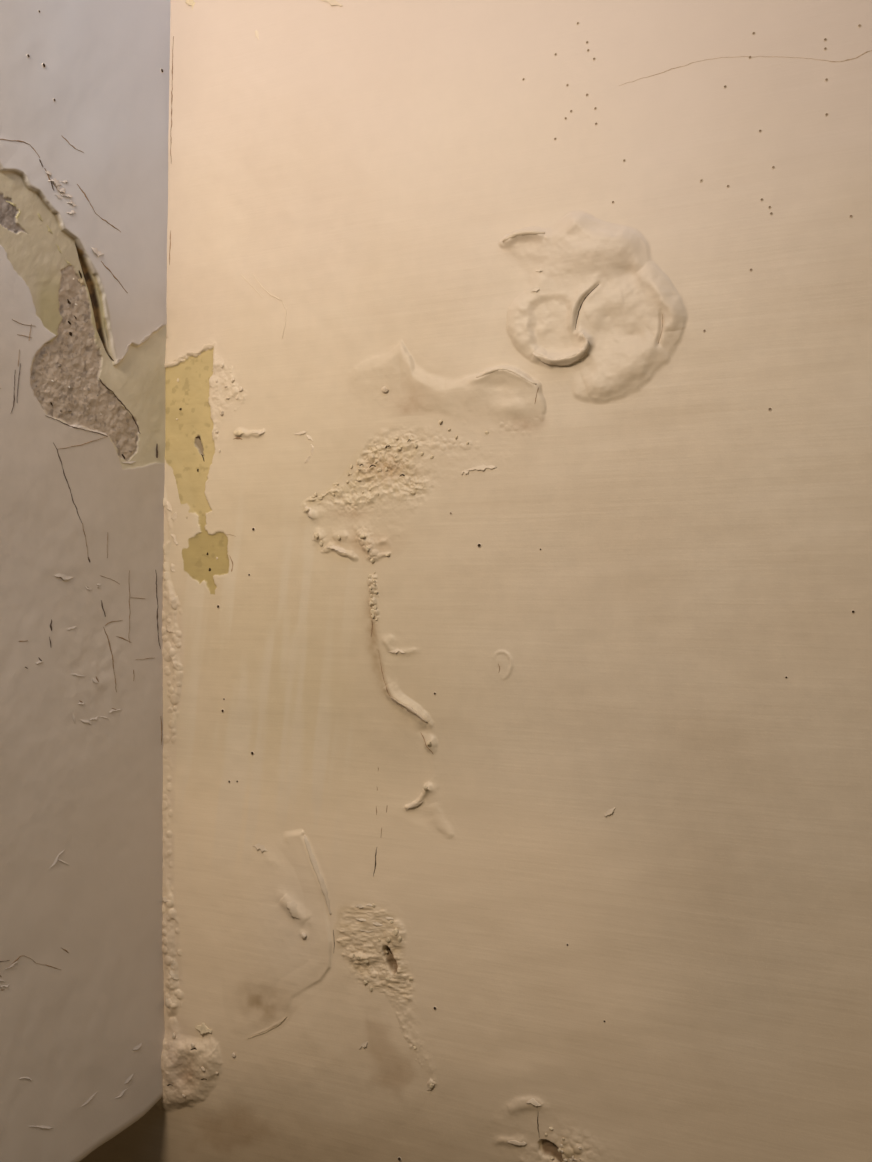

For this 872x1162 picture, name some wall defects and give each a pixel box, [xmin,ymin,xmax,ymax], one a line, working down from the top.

crack [619,50,872,86]
peeling [0,128,274,600]
spalling [298,416,523,563]
spalling [333,893,447,1095]
spalling [148,1014,235,1123]